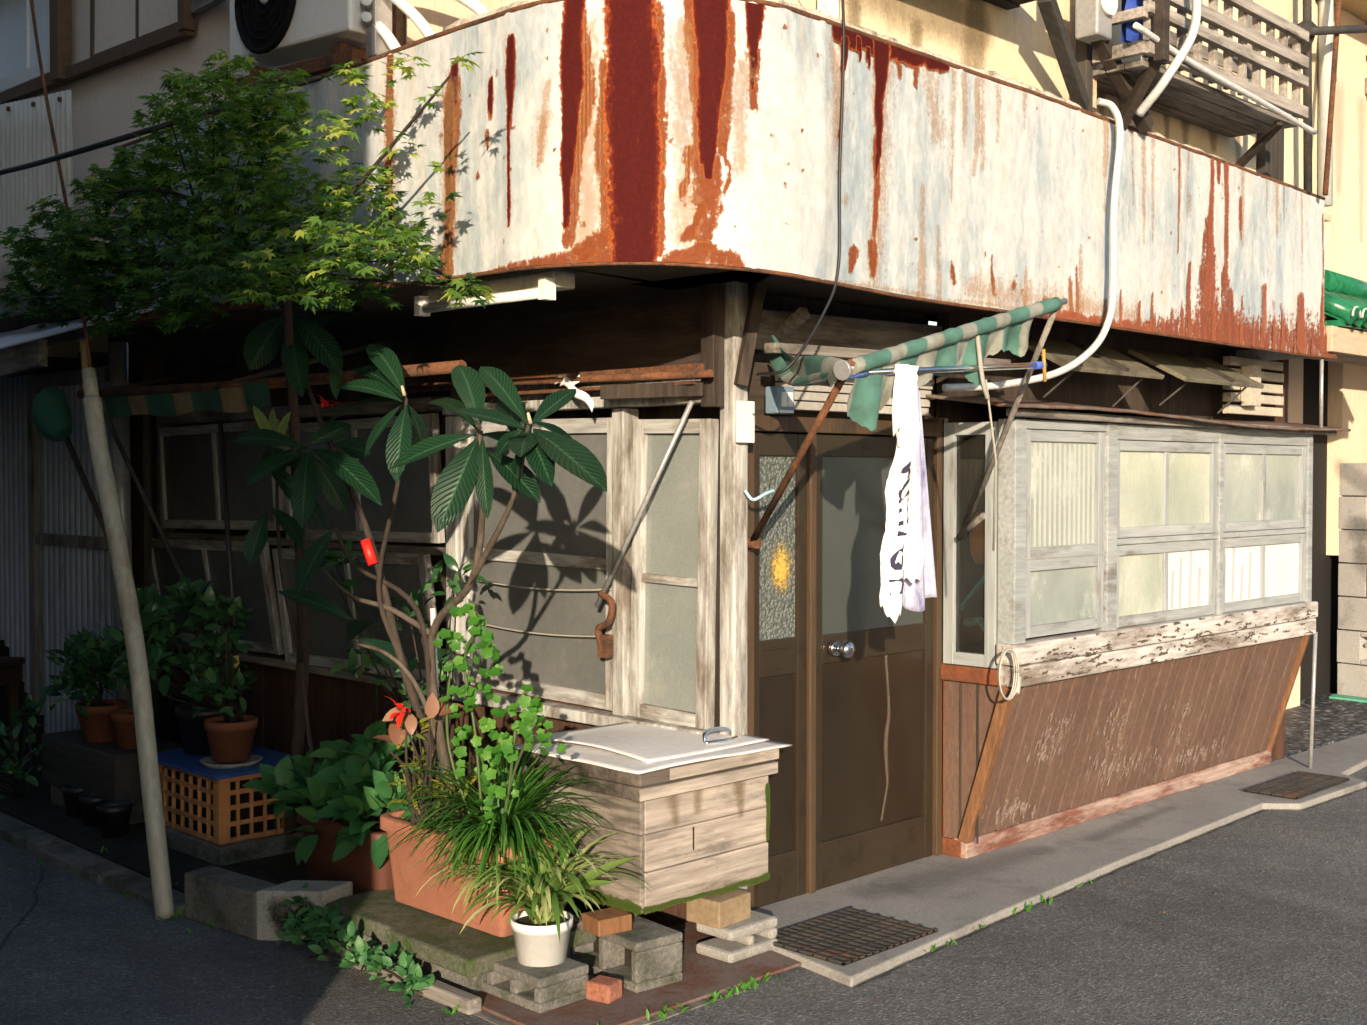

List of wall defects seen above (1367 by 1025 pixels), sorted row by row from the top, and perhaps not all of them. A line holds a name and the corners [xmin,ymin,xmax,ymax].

rust [439,33,516,278]
rust [488,0,767,272]
rust [831,25,950,278]
rust [985,251,1024,296]
rust [1043,146,1337,359]
peeling [1021,607,1316,790]